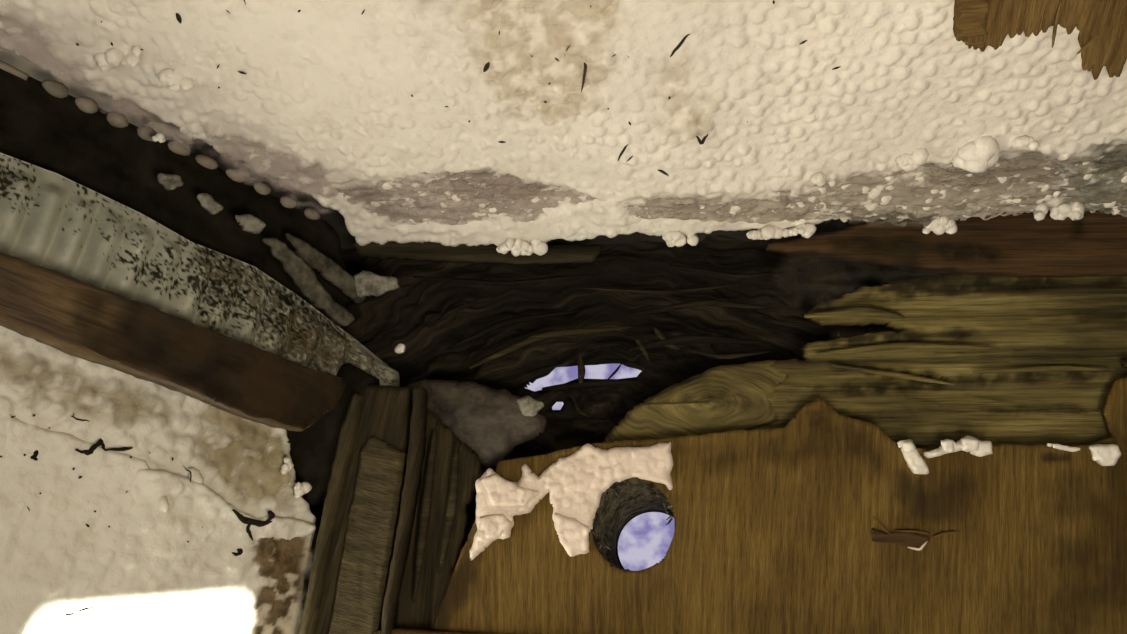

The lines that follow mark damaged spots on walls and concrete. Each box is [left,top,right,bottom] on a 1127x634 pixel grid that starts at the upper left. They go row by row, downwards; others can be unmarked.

water stain [0,16,92,87]
water stain [0,155,40,215]
water stain [204,126,338,198]
spalling [332,144,1127,459]
water stain [62,184,361,501]
peeling [477,469,540,541]
peeling [554,513,590,557]